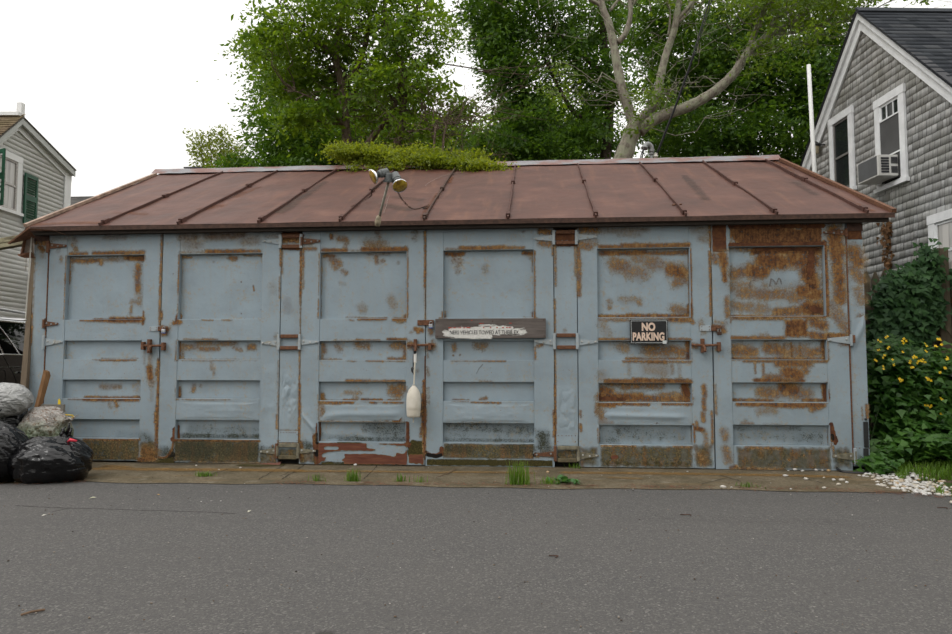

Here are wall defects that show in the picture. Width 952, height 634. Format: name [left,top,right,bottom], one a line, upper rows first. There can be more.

corrosion [59,244,146,325]
corrosion [279,232,348,333]
corrosion [321,231,435,362]
corrosion [445,223,868,479]
water stain [83,425,314,463]
peeling [318,442,407,466]